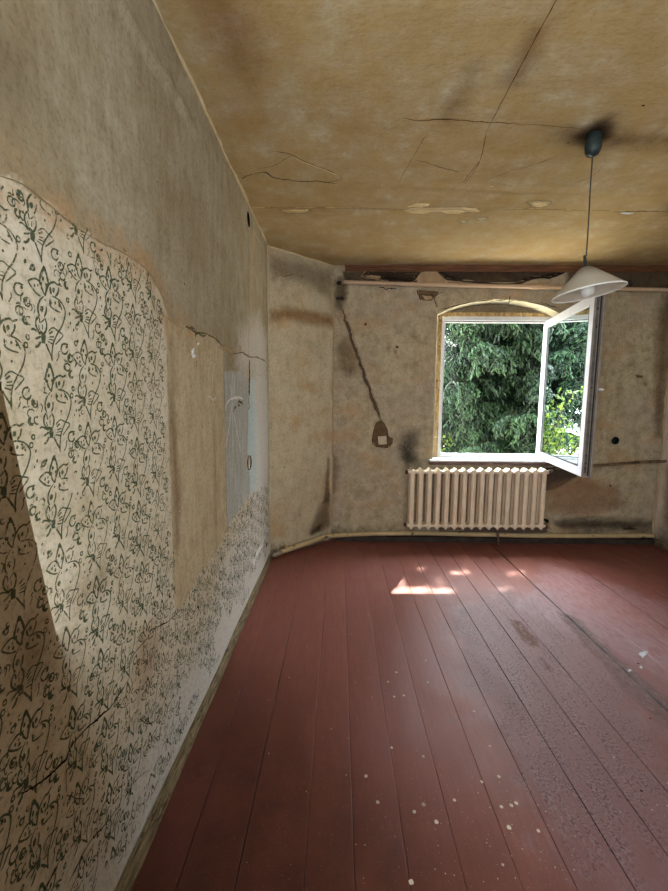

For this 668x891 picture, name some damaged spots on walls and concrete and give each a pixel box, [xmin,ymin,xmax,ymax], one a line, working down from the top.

crack [293,0,573,210]
peeling [167,317,267,363]